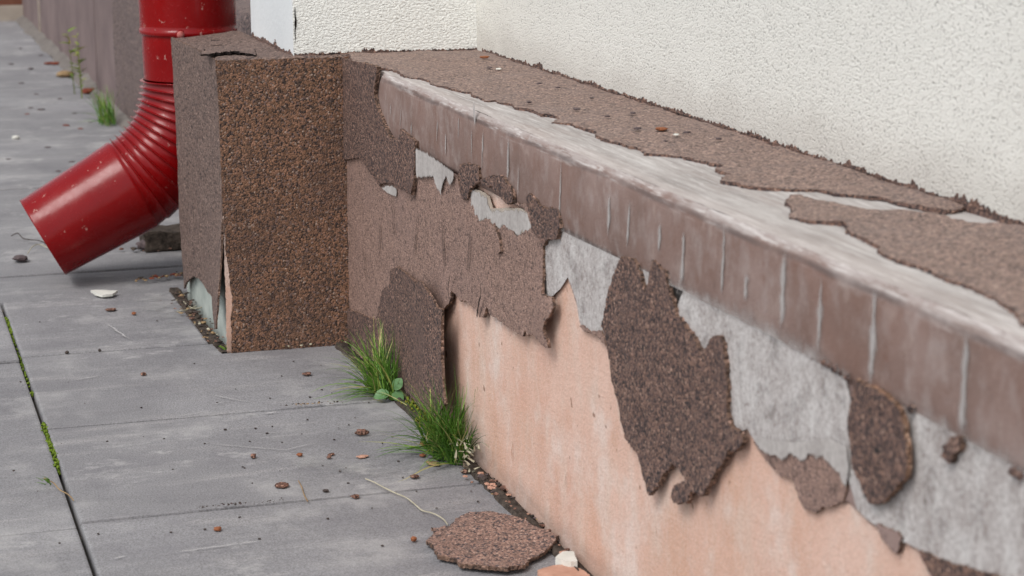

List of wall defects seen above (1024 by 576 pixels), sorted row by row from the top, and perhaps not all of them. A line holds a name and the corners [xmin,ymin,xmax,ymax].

spalling [342,50,1024,576]